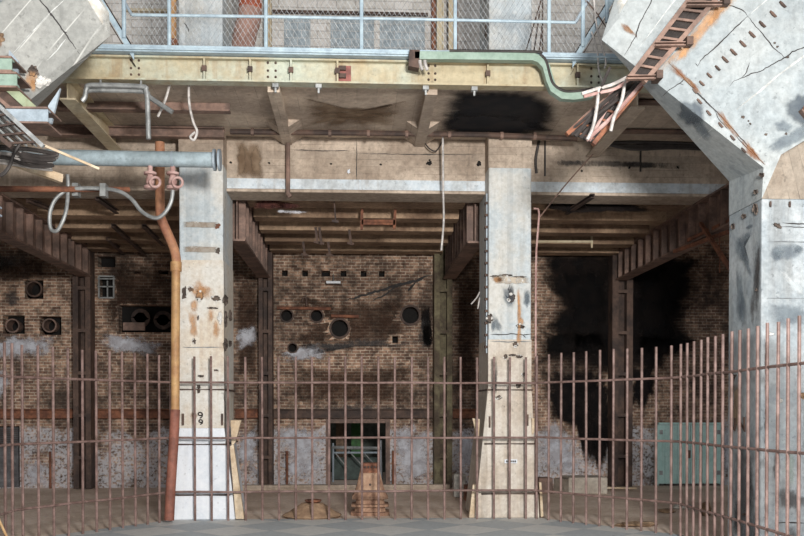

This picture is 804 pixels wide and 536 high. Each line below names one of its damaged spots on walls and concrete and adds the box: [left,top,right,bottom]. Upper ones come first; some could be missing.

crack [39,0,79,53]
crack [625,0,652,54]
corrosion [679,7,724,57]
spalling [27,65,51,89]
crack [663,5,804,165]
leakage [312,100,395,125]
leakage [445,114,546,134]
corrosion [190,285,206,333]
spalling [182,285,232,327]
peeling [490,274,527,303]
leakage [636,264,694,355]
leakage [588,382,608,465]